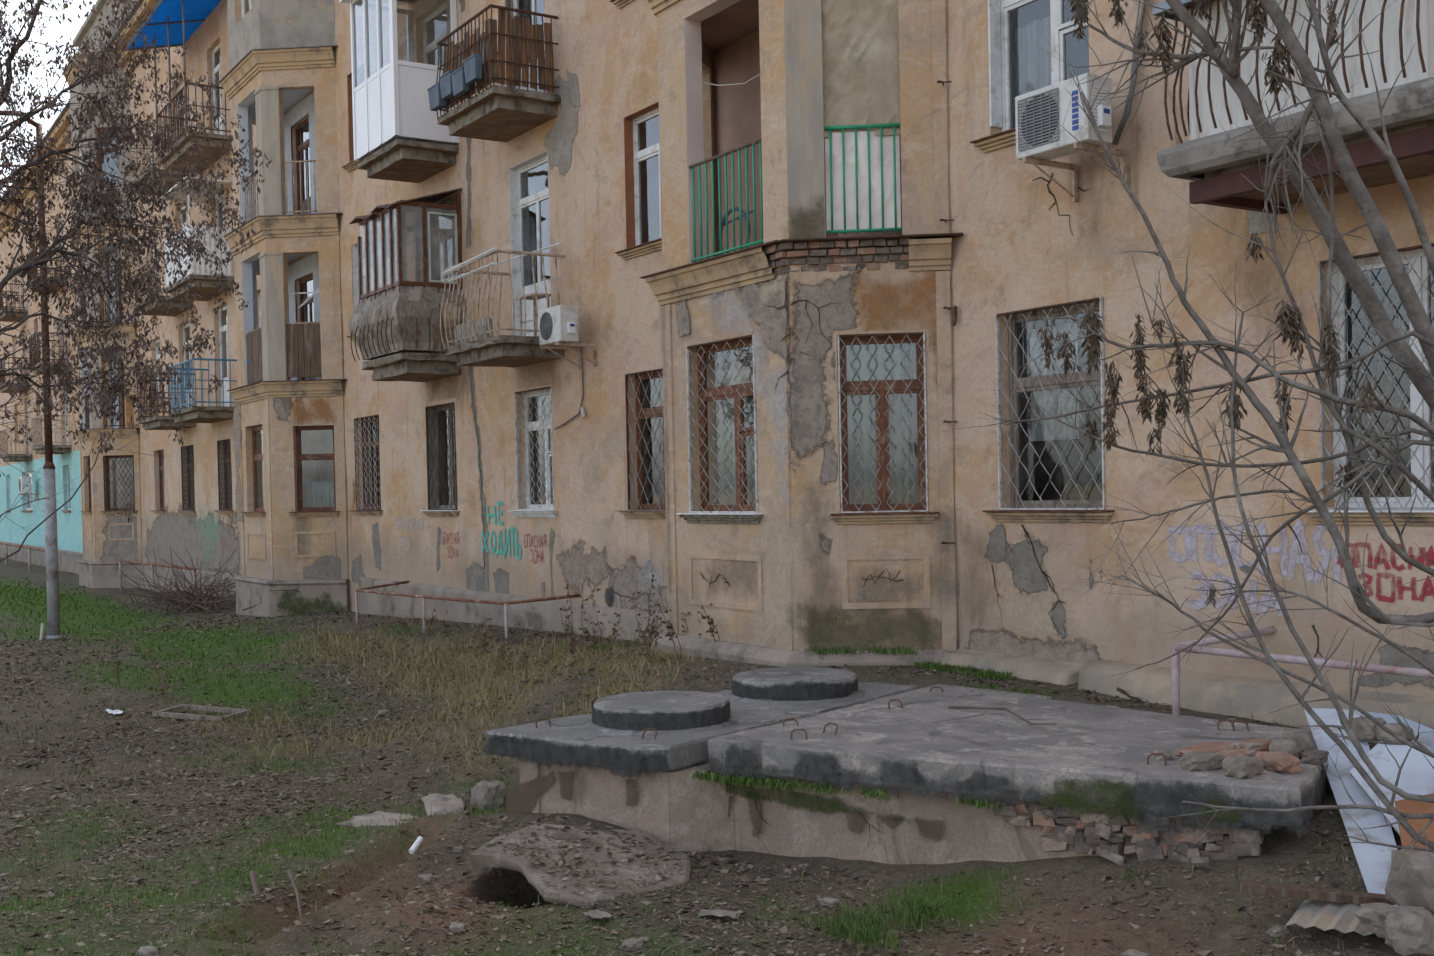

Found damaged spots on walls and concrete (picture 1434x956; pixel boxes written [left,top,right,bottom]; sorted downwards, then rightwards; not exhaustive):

flaking render [712,265,862,484]
flaking render [557,540,668,613]
spalling [985,524,1066,638]
crack [1021,525,1065,635]